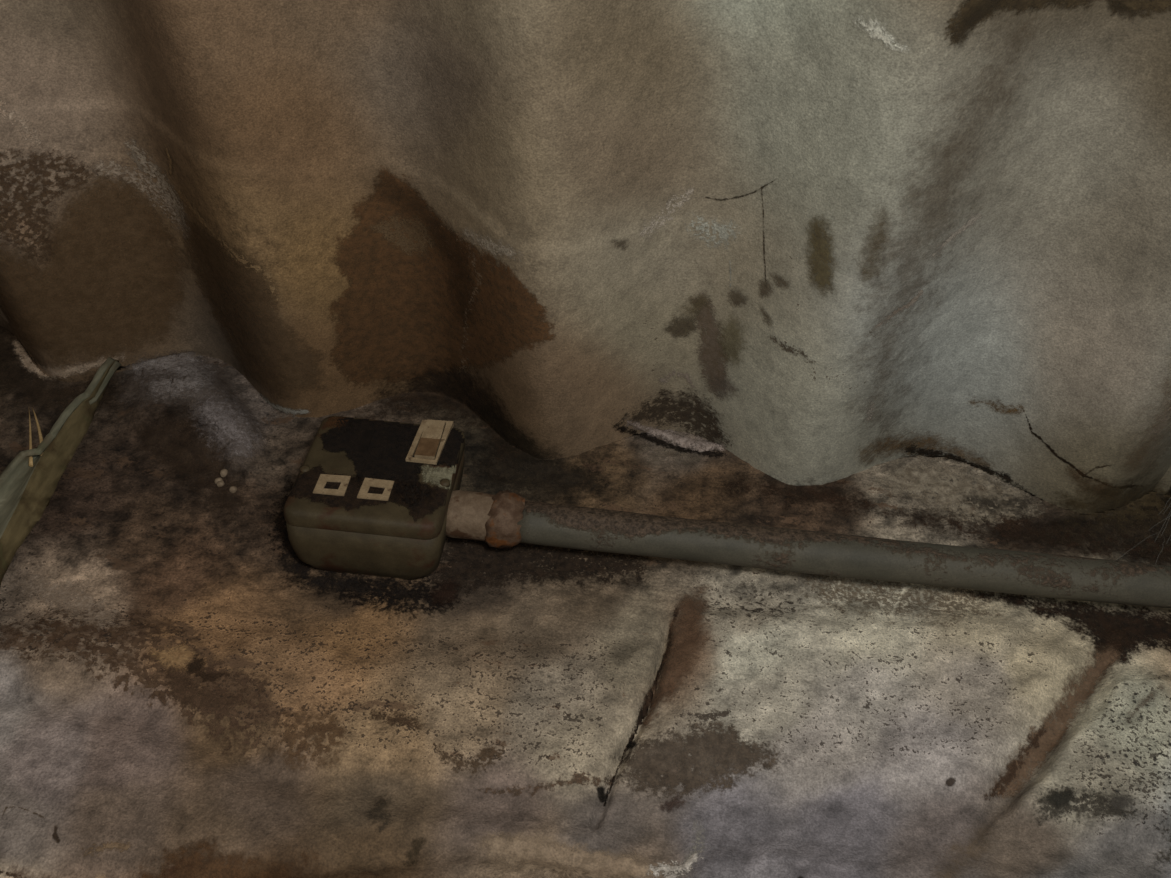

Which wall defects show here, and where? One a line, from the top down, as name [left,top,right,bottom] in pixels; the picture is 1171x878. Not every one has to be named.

damp [945,0,1092,43]
damp [1109,0,1171,17]
damp [0,170,555,416]
crack [705,181,773,281]
peeling [759,275,815,363]
damp [808,218,834,294]
peeling [614,296,740,458]
crack [971,400,1144,497]
damp [267,479,649,625]
damp [697,584,801,622]
crack [597,587,708,806]